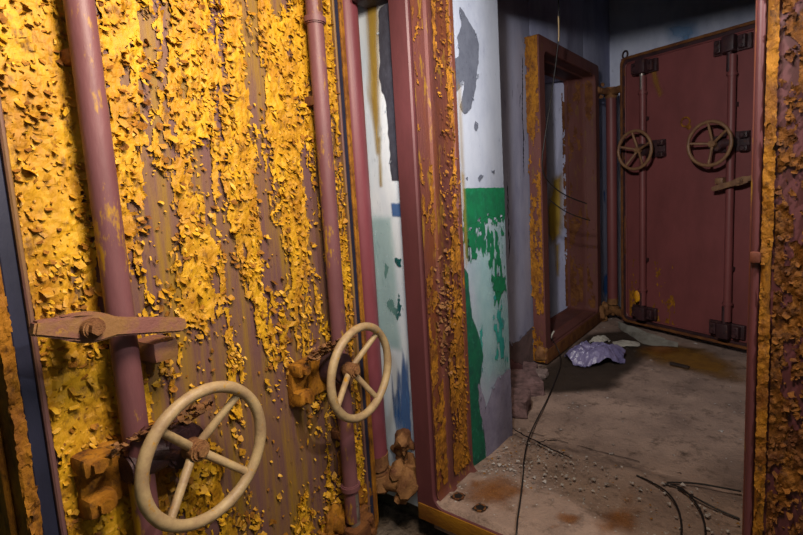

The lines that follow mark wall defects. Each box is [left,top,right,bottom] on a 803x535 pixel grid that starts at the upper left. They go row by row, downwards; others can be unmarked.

peeling [0,0,105,320]
peeling [37,337,135,535]
rust [103,38,163,133]
rust [167,0,242,77]
peeling [96,0,331,423]
peeling [322,0,354,357]
rust [433,0,471,474]
peeling [455,7,479,114]
peeling [463,175,534,457]
rust [548,177,561,275]
rust [767,280,803,475]
rust [767,471,803,535]